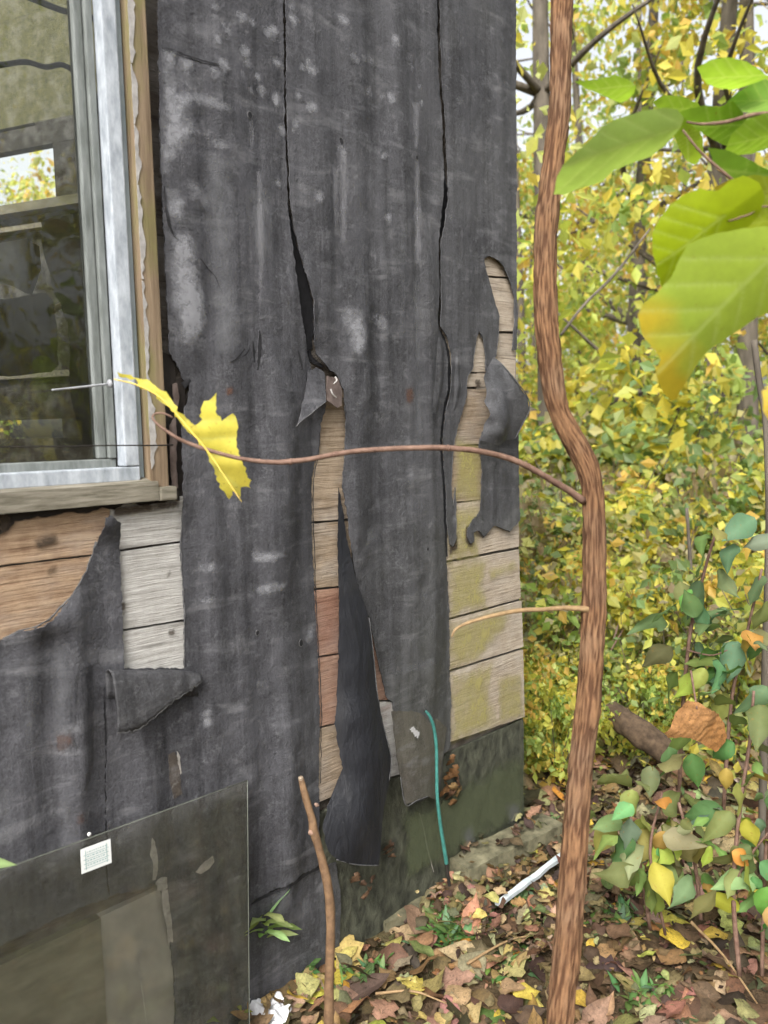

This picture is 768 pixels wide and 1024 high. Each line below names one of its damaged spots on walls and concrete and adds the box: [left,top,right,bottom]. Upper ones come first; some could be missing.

peeling [0,0,186,669]
crack [287,202,323,370]
crack [439,169,448,238]
crack [439,329,451,557]
peeling [295,255,530,866]